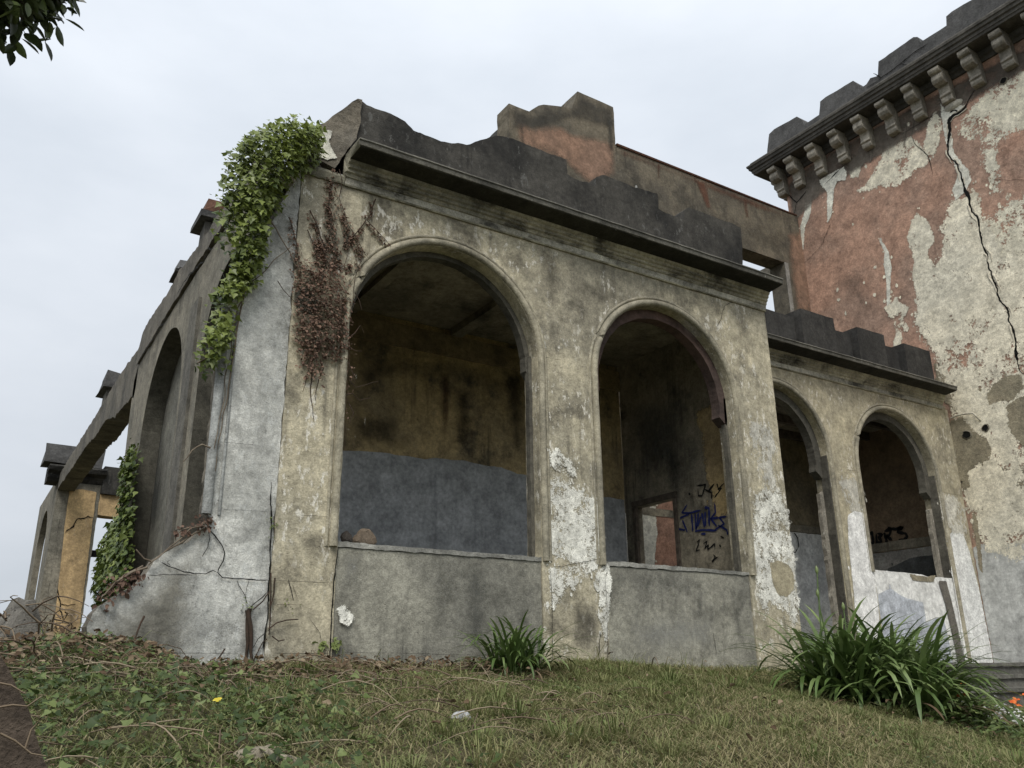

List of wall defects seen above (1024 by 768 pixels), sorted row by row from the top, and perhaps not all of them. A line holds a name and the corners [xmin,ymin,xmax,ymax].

peeling [791,204,811,311]
crack [907,90,1023,374]
peeling [819,71,1024,663]
crack [151,482,355,661]
peeling [336,605,355,626]
peeling [546,447,612,641]
peeling [746,415,800,628]